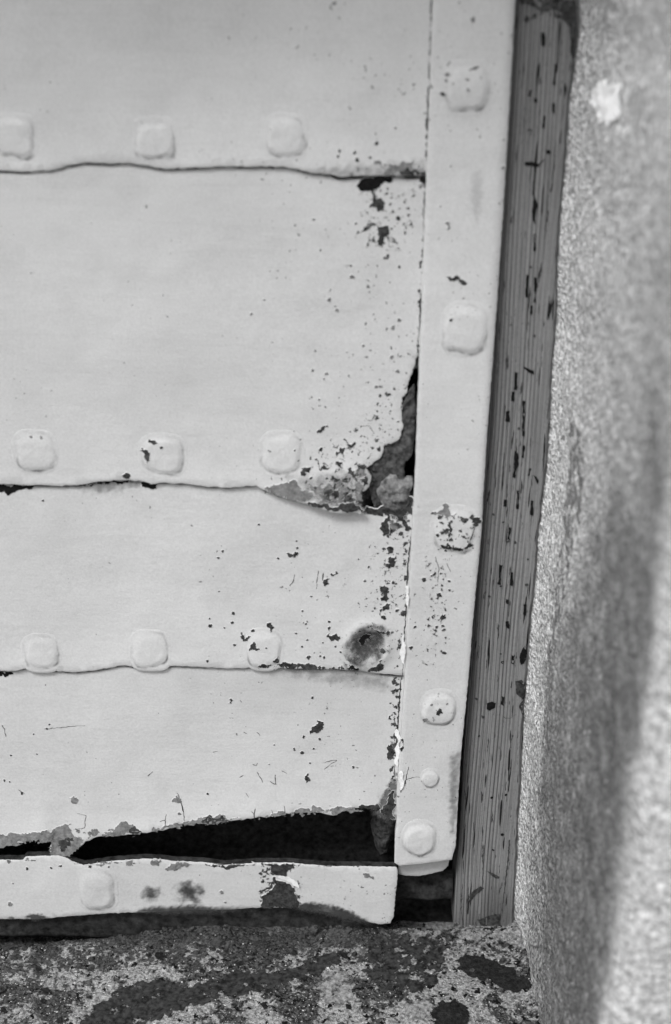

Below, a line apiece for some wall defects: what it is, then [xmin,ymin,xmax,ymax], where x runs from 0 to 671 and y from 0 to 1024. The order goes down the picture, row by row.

peeling [336,140,380,163]
peeling [352,160,426,269]
peeling [264,425,369,513]
rust [418,502,483,667]
rust [258,384,417,856]
peeling [0,815,112,869]
rust [69,828,135,840]
peeling [105,820,141,836]
peeling [150,858,191,871]
peeling [160,813,242,831]
peeling [204,861,300,909]
peeling [265,803,381,818]